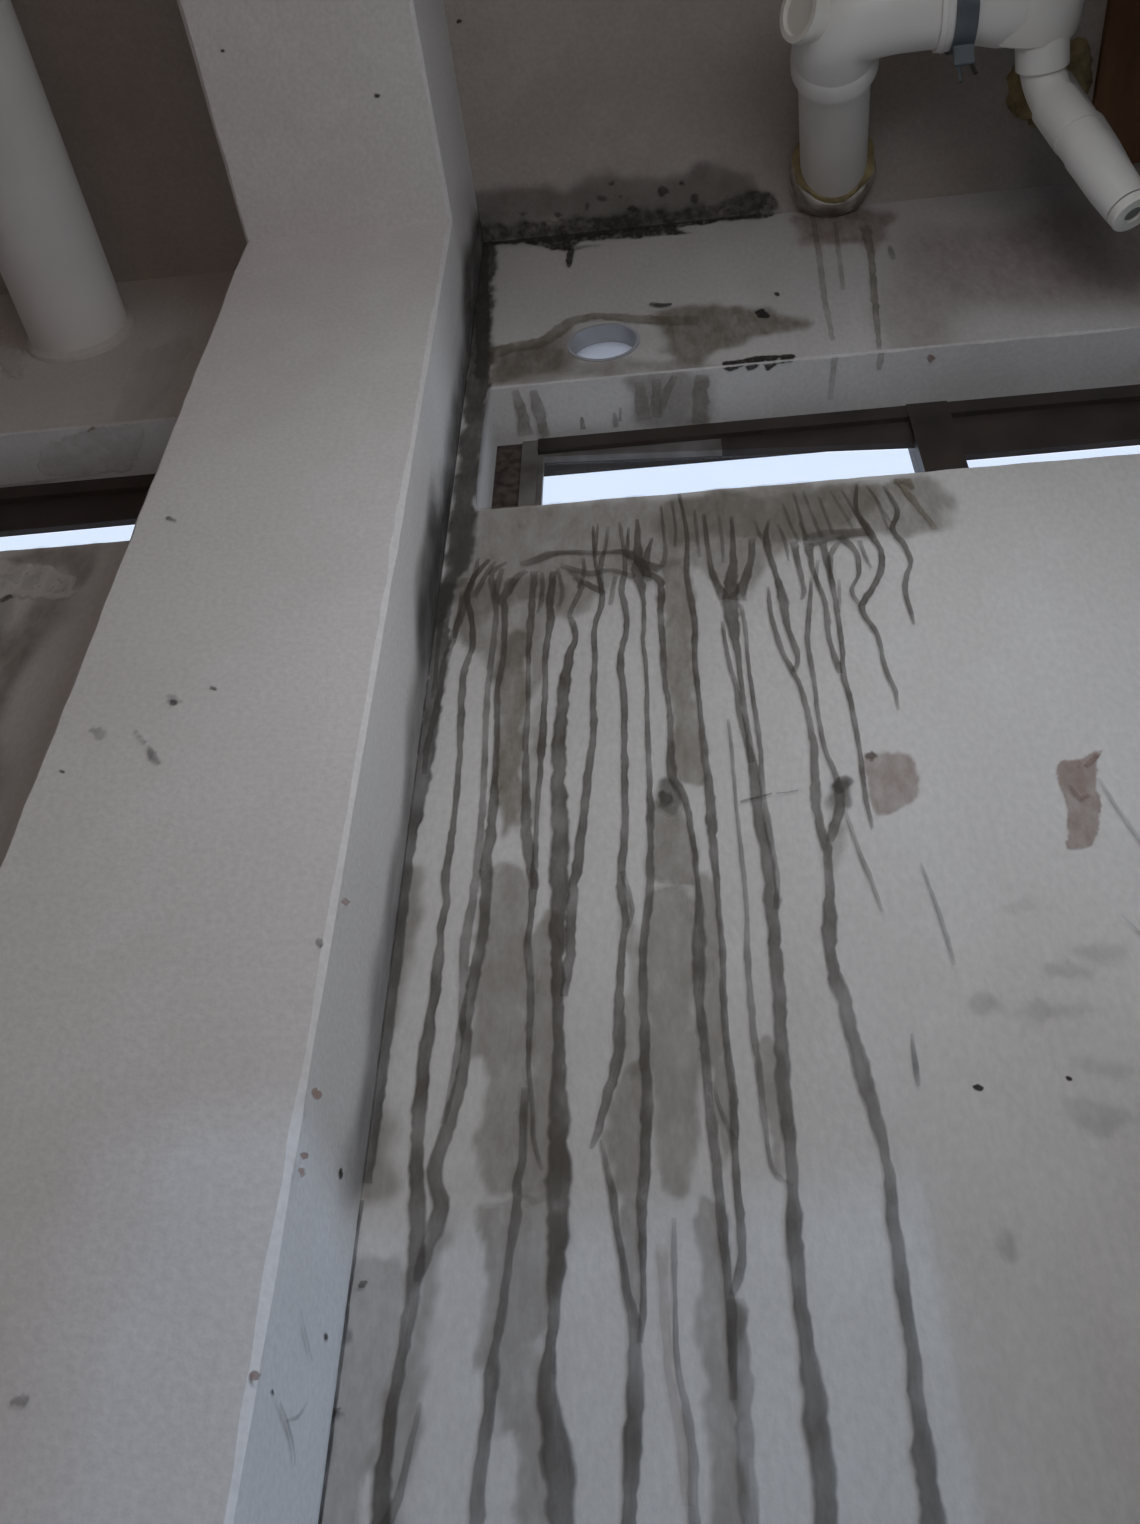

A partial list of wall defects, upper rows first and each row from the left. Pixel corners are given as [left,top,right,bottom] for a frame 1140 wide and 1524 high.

water stain [363,182,946,1524]